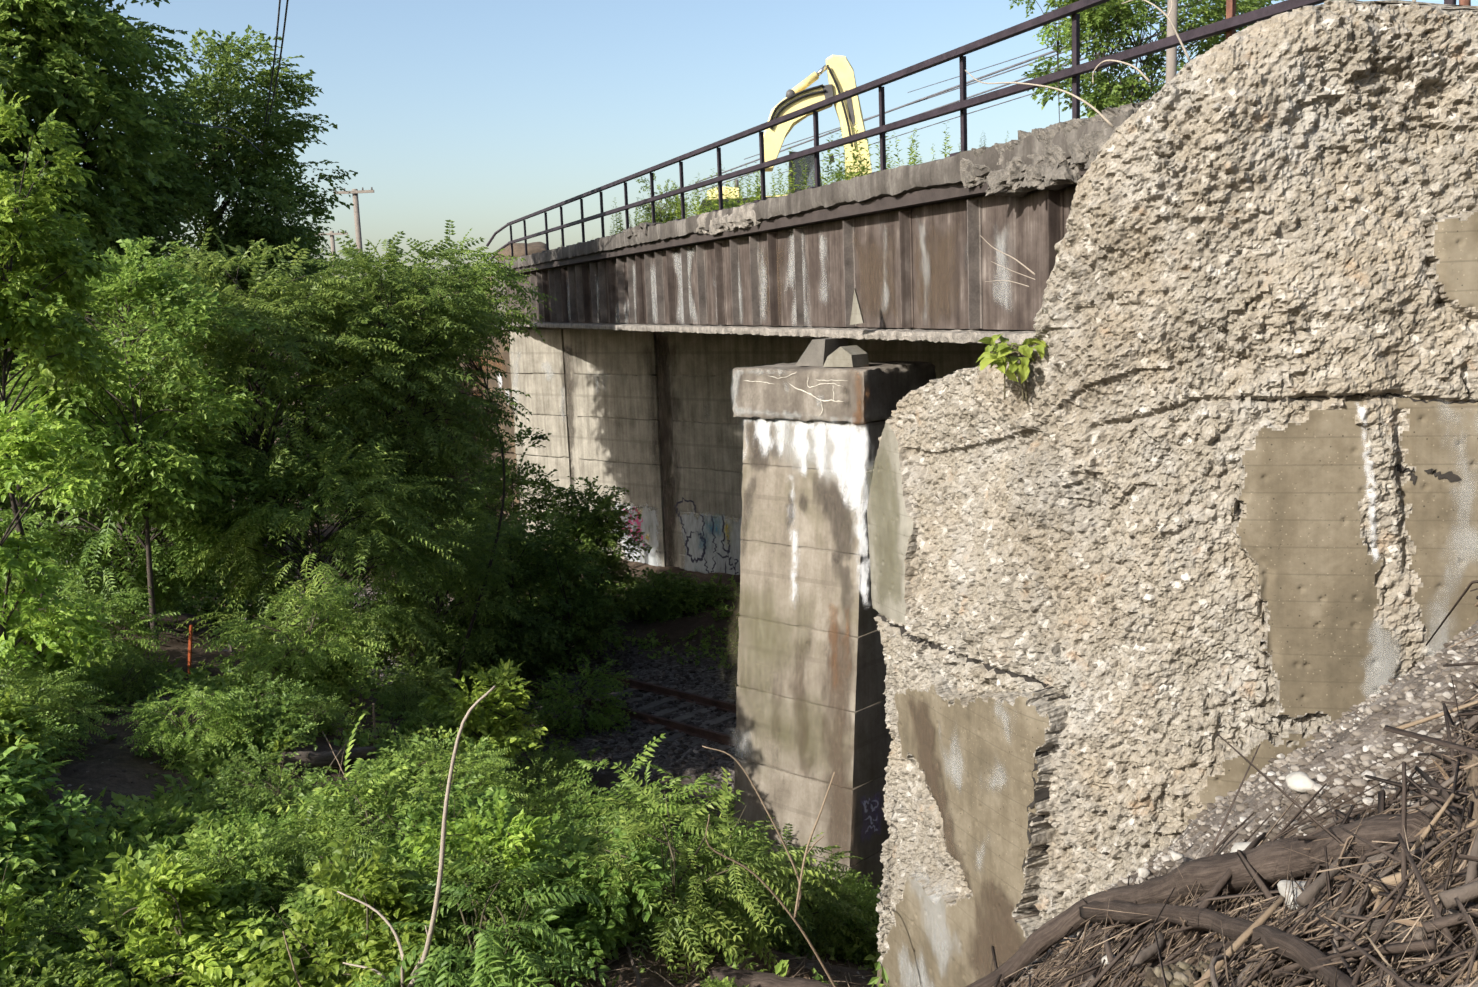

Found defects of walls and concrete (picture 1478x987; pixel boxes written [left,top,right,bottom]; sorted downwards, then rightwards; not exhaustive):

corrosion [758,251,781,313]
corrosion [855,239,897,316]
corrosion [916,232,957,319]
crack [1217,374,1478,404]
damp [750,418,867,605]
spalling [873,0,1478,970]
damp [1366,453,1377,557]
crack [867,606,1068,699]